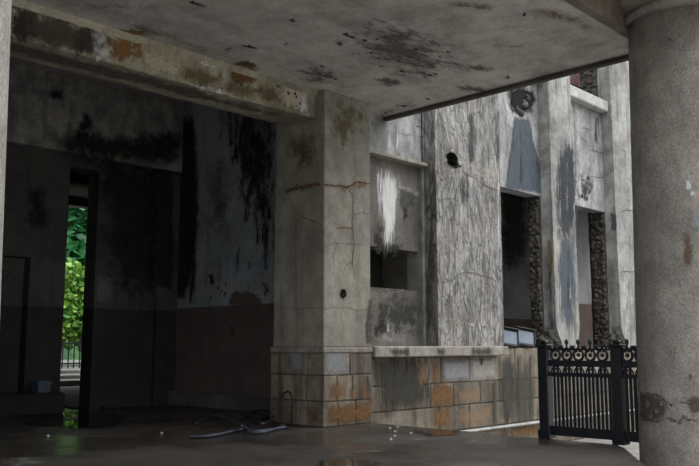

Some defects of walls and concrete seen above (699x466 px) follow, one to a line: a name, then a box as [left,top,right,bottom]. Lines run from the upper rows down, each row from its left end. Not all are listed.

rust [108,29,147,62]
rust [227,61,263,98]
leakage [344,21,490,86]
leakage [60,114,199,303]
leakage [10,6,276,256]
crack [286,181,370,276]
leakage [375,164,433,256]
hole [445,149,462,169]
leakage [500,87,541,270]
leakage [549,139,593,328]
leakage [367,289,430,418]
spalling [640,392,668,422]